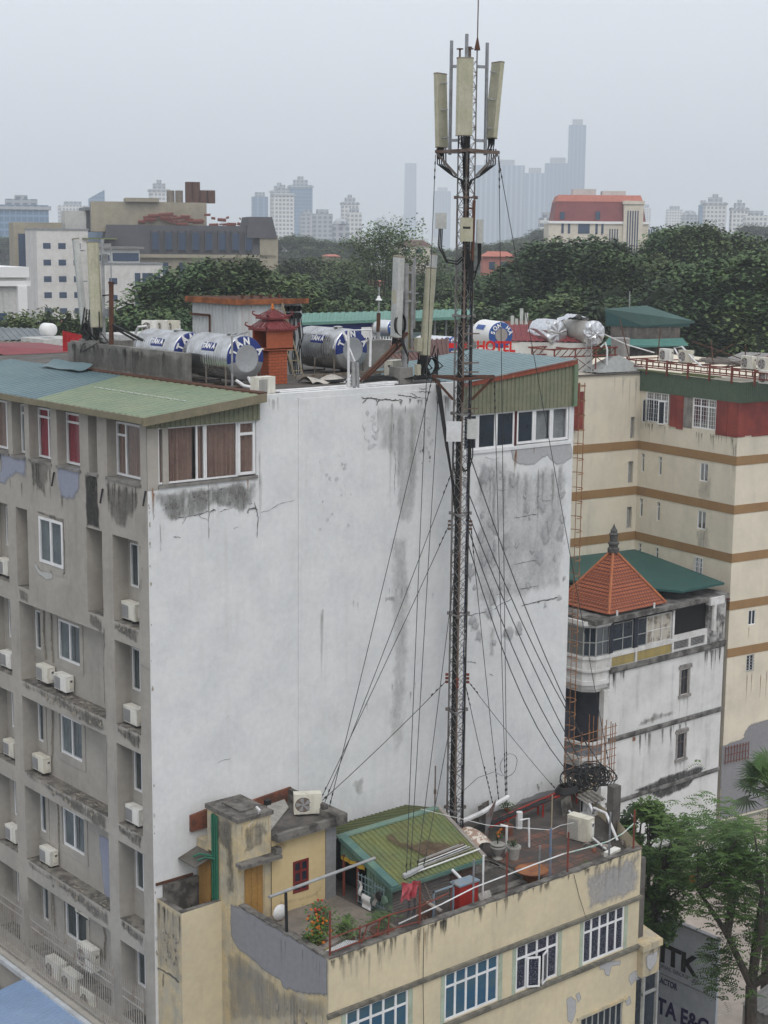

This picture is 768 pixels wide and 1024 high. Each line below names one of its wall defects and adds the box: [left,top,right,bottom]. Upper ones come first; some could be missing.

crack [362,388,430,406]
leakage [85,475,136,527]
leakage [161,484,251,519]
crack [153,485,294,552]
peeling [625,948,659,1006]
peeling [567,993,581,1023]